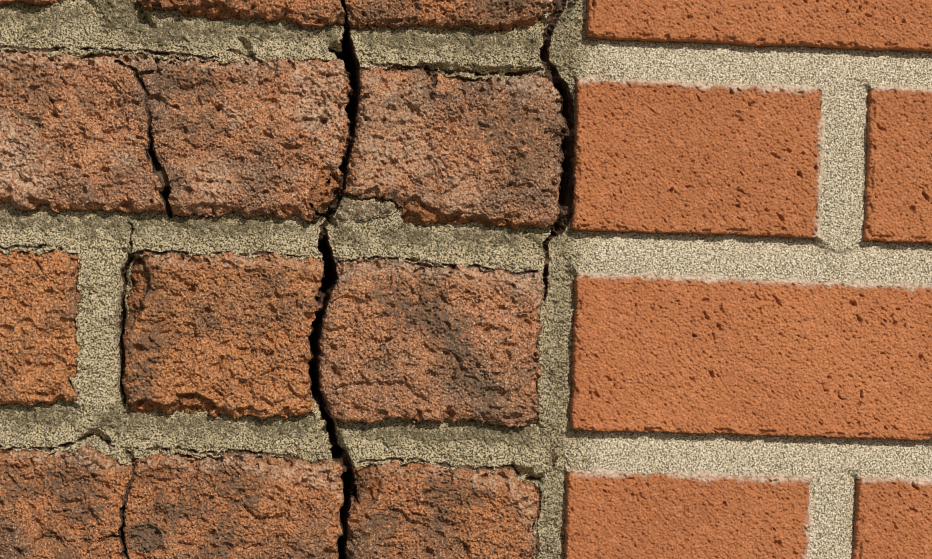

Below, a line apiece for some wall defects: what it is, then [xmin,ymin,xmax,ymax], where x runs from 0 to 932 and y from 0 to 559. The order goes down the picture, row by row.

crack [0,0,576,559]